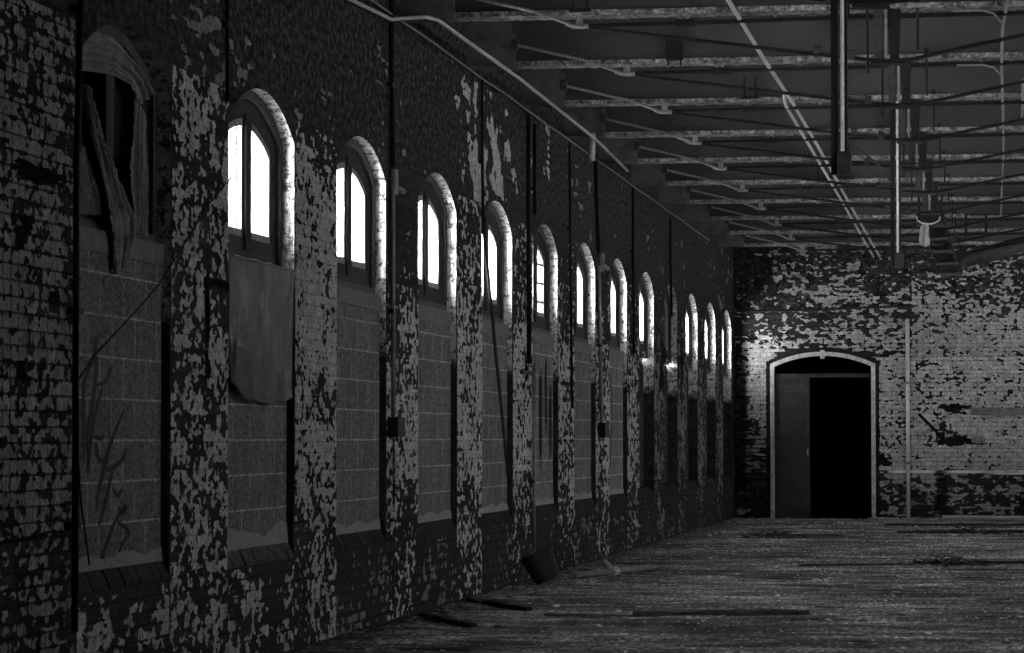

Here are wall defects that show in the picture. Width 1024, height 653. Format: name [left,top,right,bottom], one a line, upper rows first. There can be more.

peeling [531,125,573,179]
peeling [0,0,533,653]
peeling [544,242,1024,568]